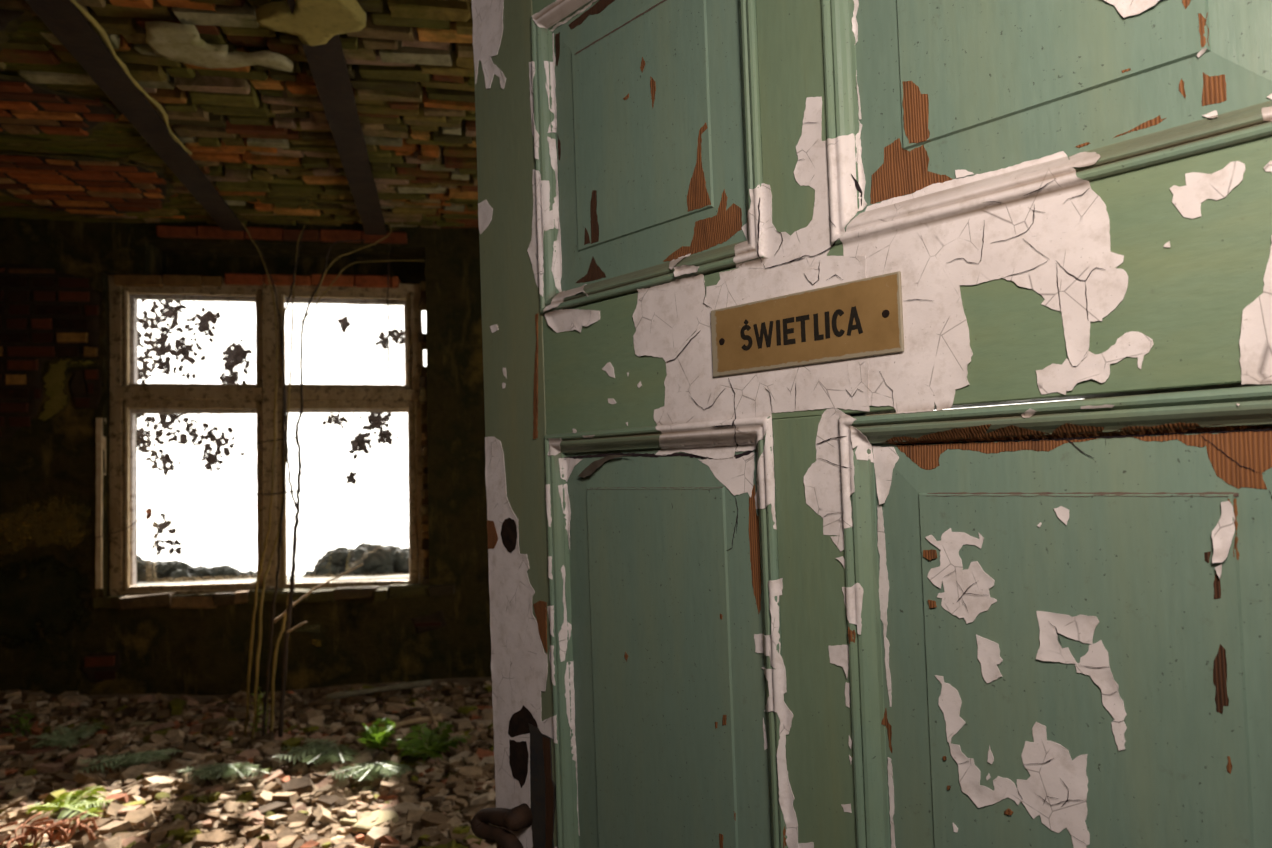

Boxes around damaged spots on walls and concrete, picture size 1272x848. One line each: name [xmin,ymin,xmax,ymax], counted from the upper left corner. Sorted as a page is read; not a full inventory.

flaking render [145,21,293,72]
flaking render [256,0,366,46]
peeling [1104,0,1160,18]
peeling [1182,0,1209,58]
flaking render [0,151,176,218]
peeling [478,200,493,234]
peeling [527,0,631,549]
crack [947,180,1106,321]
peeling [632,70,1272,848]
crack [896,428,1272,497]
peeling [485,437,580,836]
peeling [497,826,533,848]